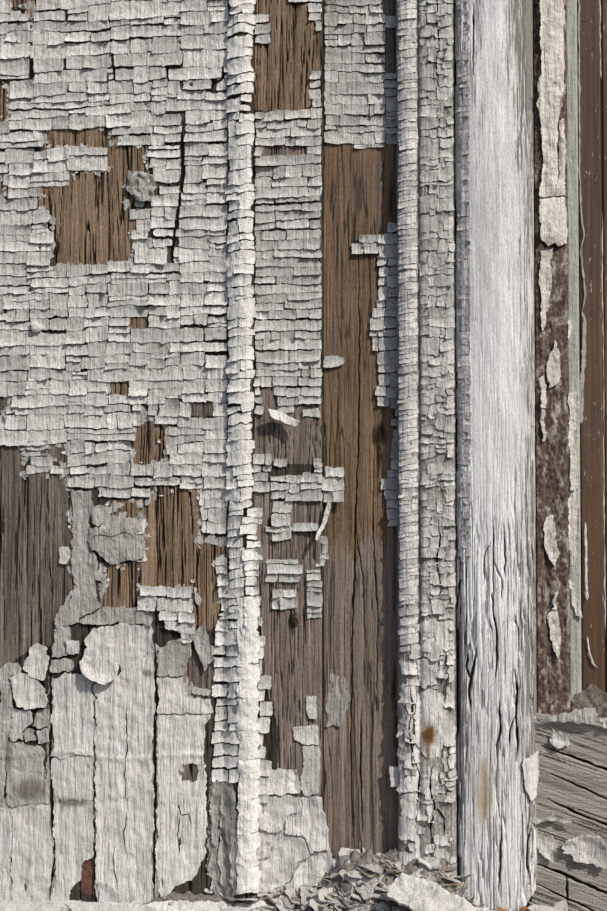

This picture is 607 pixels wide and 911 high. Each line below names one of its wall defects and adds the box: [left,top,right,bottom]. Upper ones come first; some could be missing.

crack [435,0,474,136]
crack [172,119,185,251]
crack [451,175,459,353]
peeling [0,0,471,911]
crack [408,418,519,862]
crack [47,644,57,897]
crack [93,699,128,894]
rust [421,726,435,762]
peeling [531,813,572,824]
crack [526,828,607,911]
peeling [536,835,607,869]
peeling [543,707,607,749]